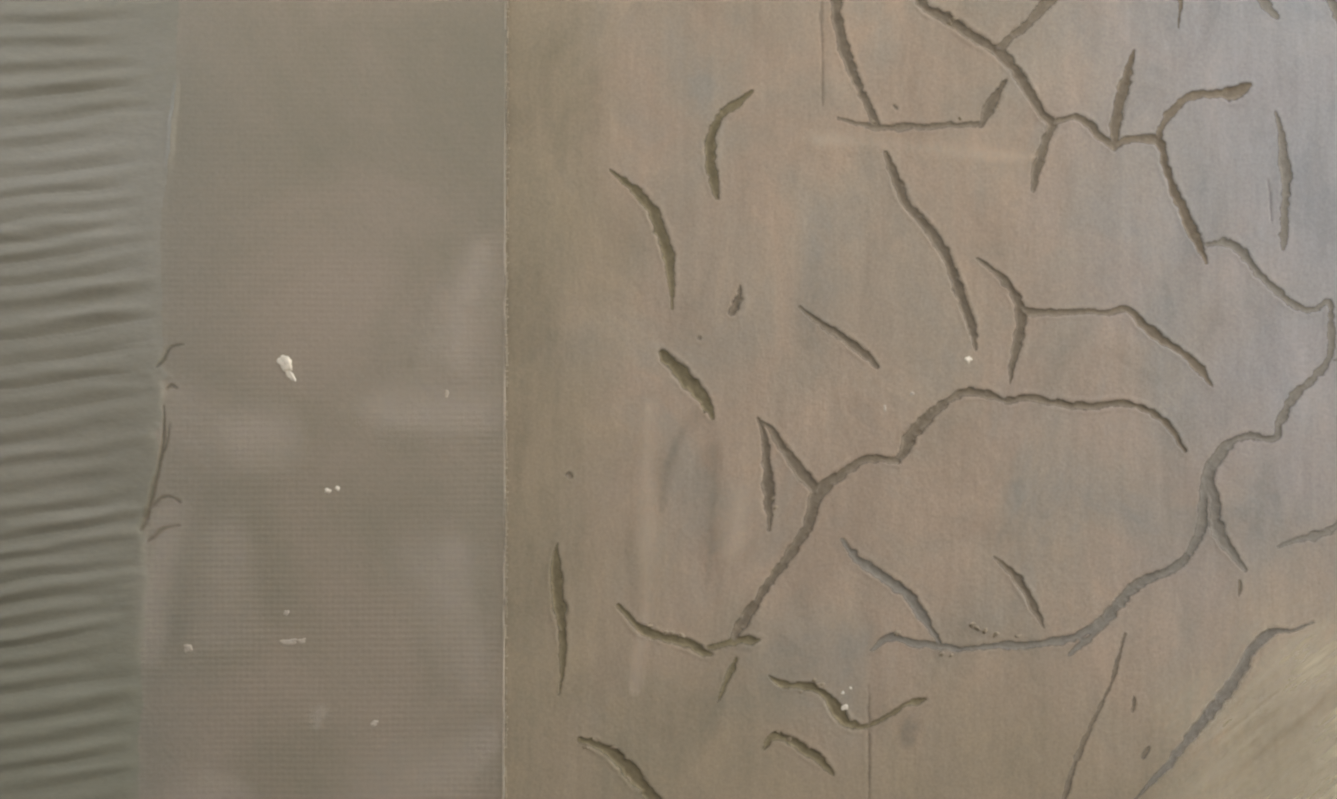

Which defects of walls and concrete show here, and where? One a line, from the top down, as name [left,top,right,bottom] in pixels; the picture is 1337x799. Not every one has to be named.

crack [610,0,1337,799]
crack [550,543,567,695]
crack [578,737,661,799]